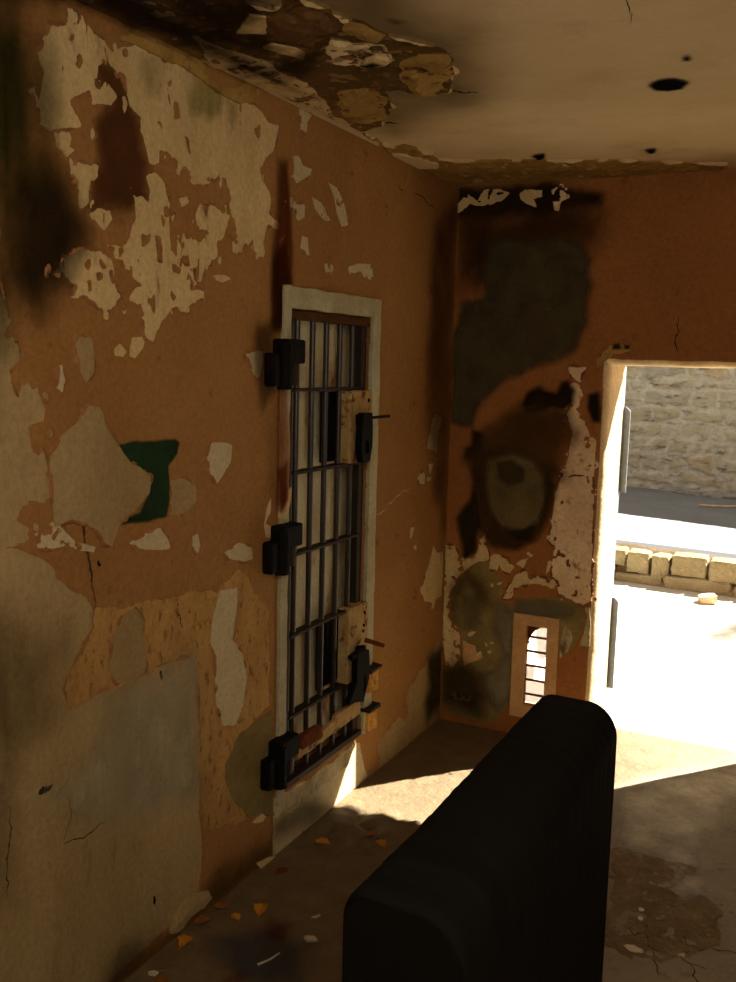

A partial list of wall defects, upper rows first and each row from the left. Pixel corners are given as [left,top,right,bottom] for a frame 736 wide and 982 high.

leakage [9,165,85,306]
peeling [30,0,728,358]
leakage [430,204,594,446]
peeling [0,275,367,982]
peeling [377,344,631,768]
leakage [465,408,573,549]
spalling [604,847,733,964]
crack [629,920,735,982]